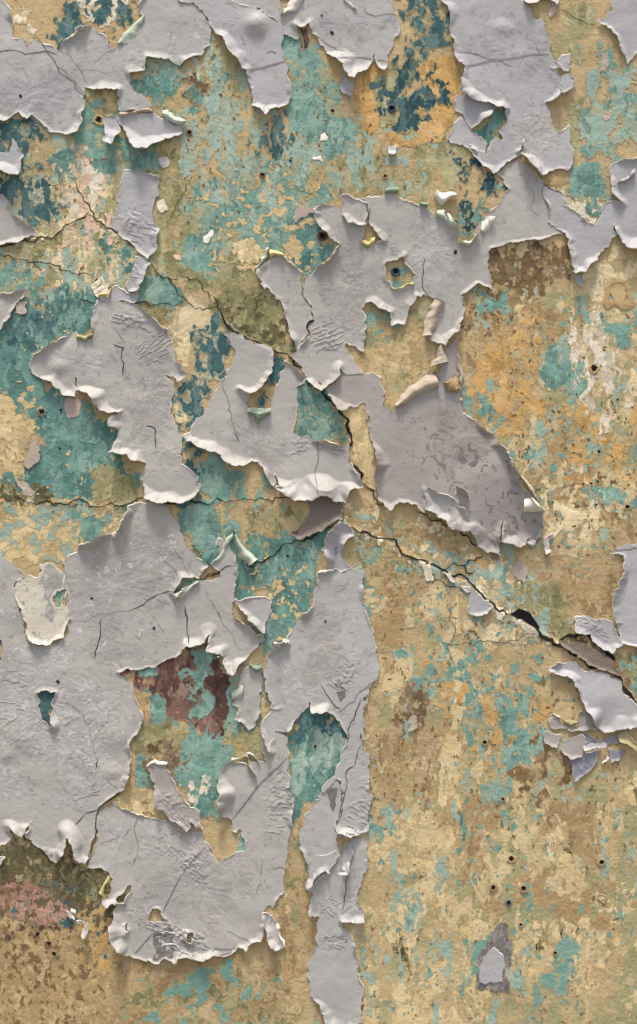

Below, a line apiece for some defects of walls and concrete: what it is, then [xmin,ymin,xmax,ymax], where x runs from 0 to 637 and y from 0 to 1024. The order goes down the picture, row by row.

peeling [549,0,559,18]
peeling [596,0,637,73]
peeling [574,42,637,135]
flaking render [497,290,534,325]
crack [79,511,636,703]